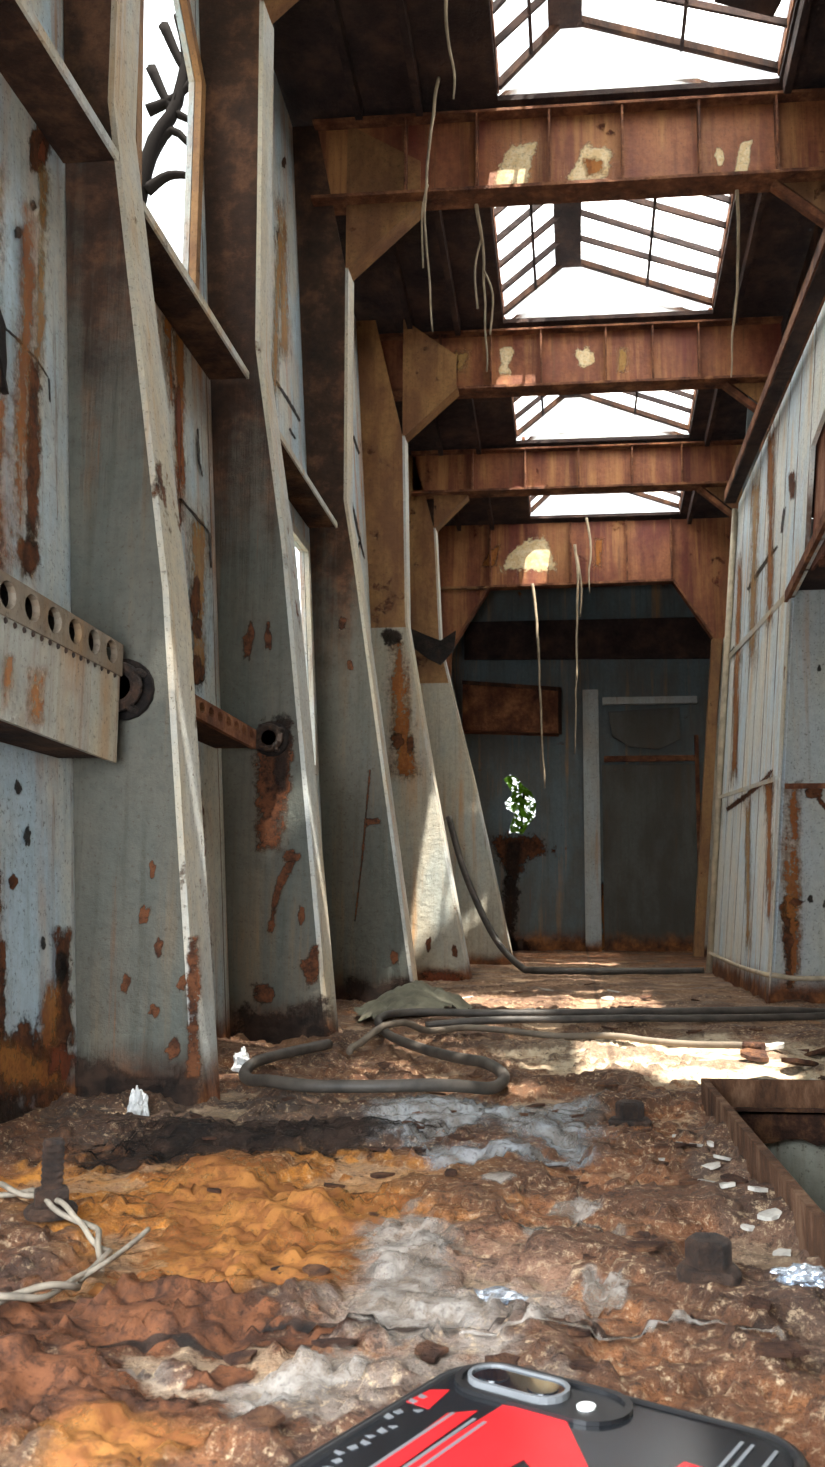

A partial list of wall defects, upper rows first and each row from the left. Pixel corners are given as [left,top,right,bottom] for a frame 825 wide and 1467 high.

peeling [494,142,537,185]
peeling [567,142,612,180]
peeling [714,140,753,171]
rust [0,169,49,578]
peeling [498,347,514,376]
peeling [575,347,595,368]
peeling [482,536,557,574]
rust [381,629,418,779]
rust [727,422,825,989]
rust [252,712,301,933]
rust [0,871,18,912]
rust [0,925,464,1467]